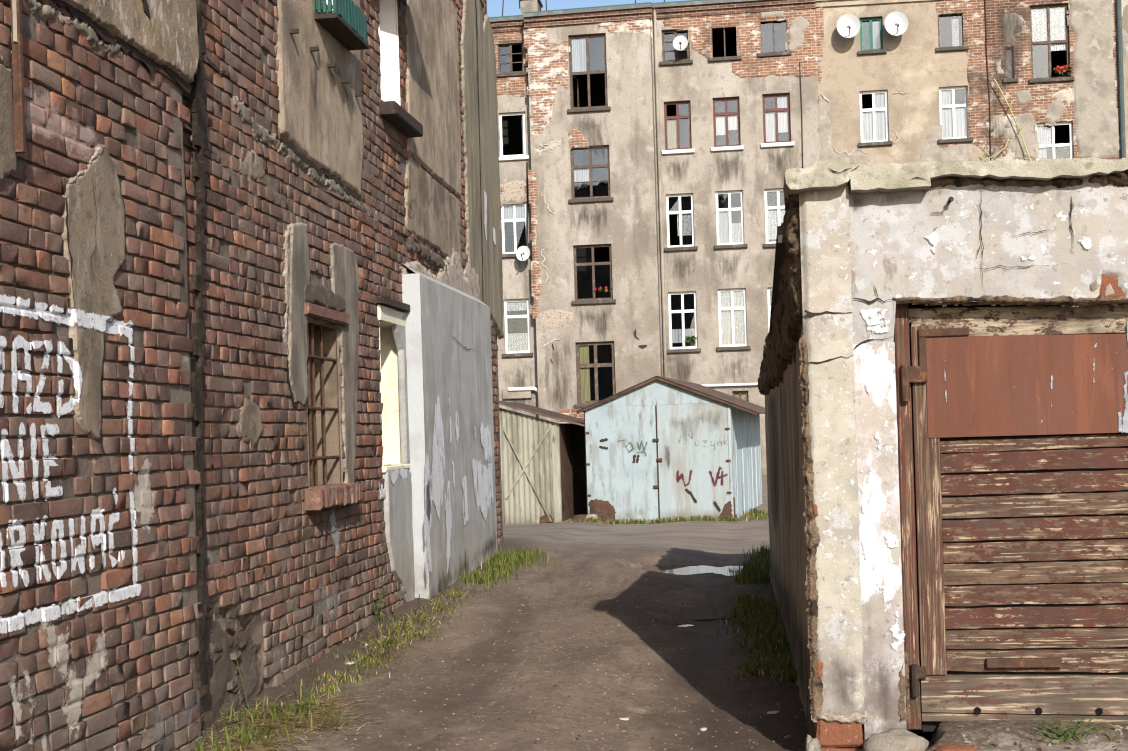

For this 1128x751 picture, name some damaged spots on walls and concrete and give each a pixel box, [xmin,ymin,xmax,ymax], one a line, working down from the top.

flaking render [0,55,17,182]
flaking render [60,143,126,439]
flaking render [27,0,200,93]
crack [190,0,226,688]
flaking render [404,0,589,348]
flaking render [597,7,830,114]
spalling [860,274,1128,333]
flaking render [920,0,1128,162]
crack [975,190,1073,288]
spalling [930,169,1128,189]
peeling [1118,371,1128,433]
peeling [424,393,494,581]